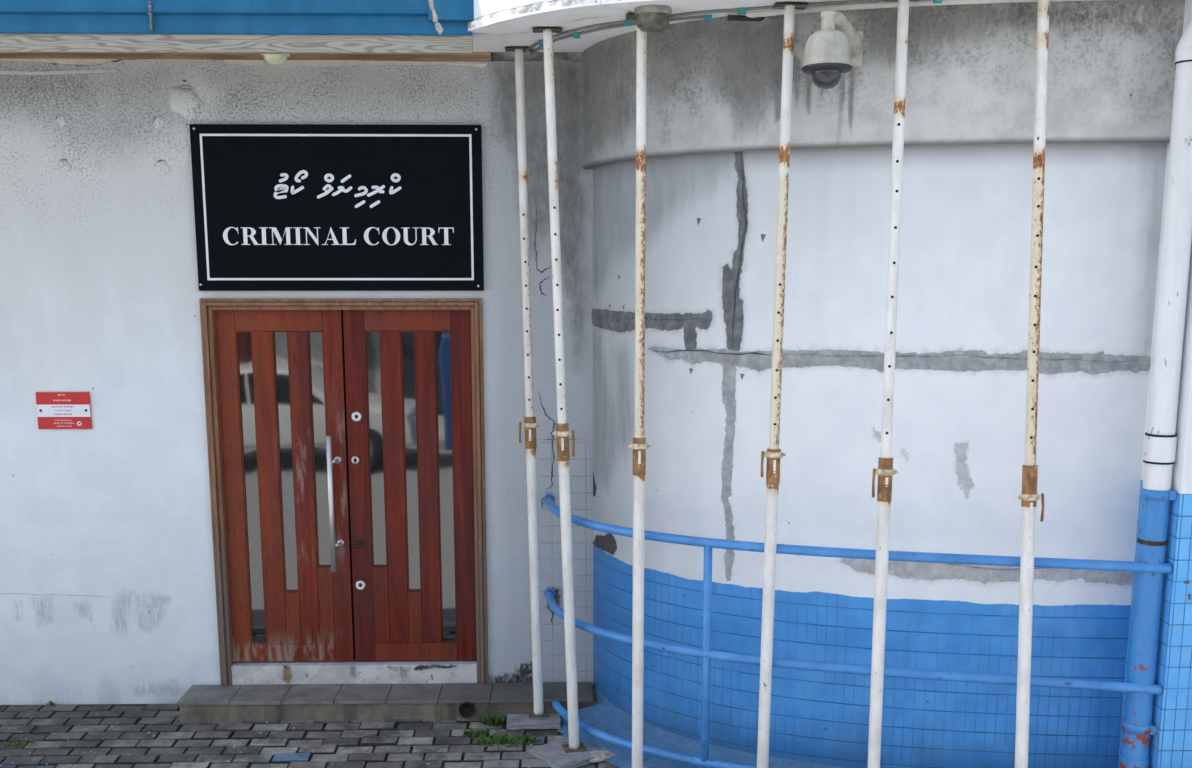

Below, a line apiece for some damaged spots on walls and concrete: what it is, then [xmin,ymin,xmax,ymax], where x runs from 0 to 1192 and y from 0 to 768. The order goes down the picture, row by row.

crack [538,393,576,510]
peeling [593,533,617,555]